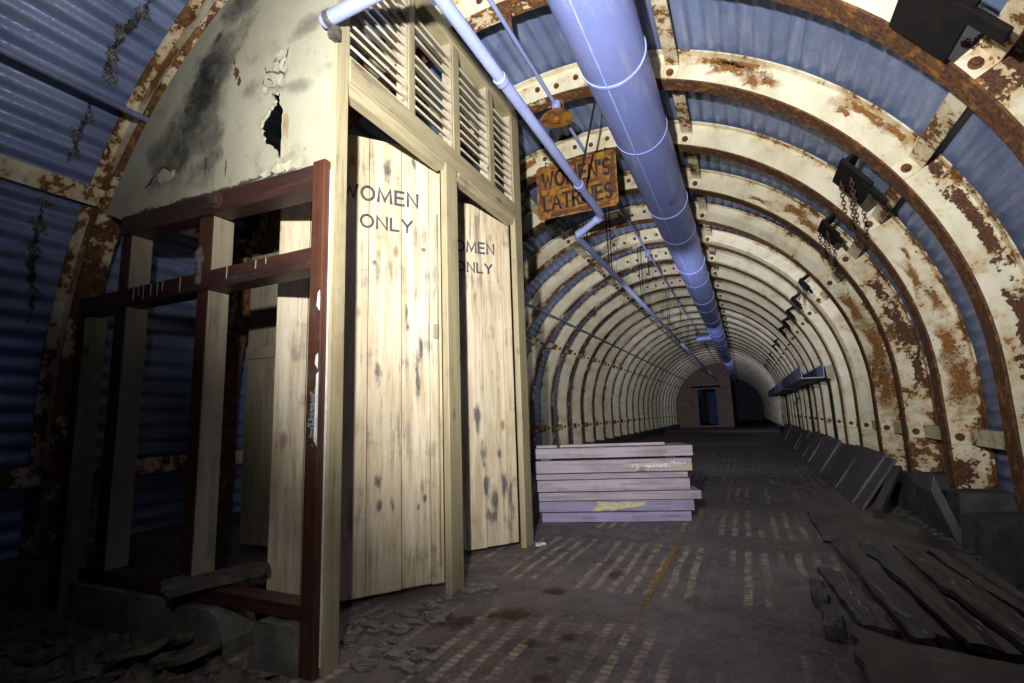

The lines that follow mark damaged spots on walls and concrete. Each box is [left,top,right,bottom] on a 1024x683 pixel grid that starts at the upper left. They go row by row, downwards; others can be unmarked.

rust [100,0,156,89]
damp [148,32,235,185]
spalling [259,50,293,178]
rust [696,57,775,88]
rust [837,98,910,144]
rust [960,33,985,49]
rust [980,45,1024,102]
rust [902,248,945,310]
rust [926,157,1024,379]
rust [836,278,929,409]
rust [934,325,976,406]
rust [946,457,981,489]